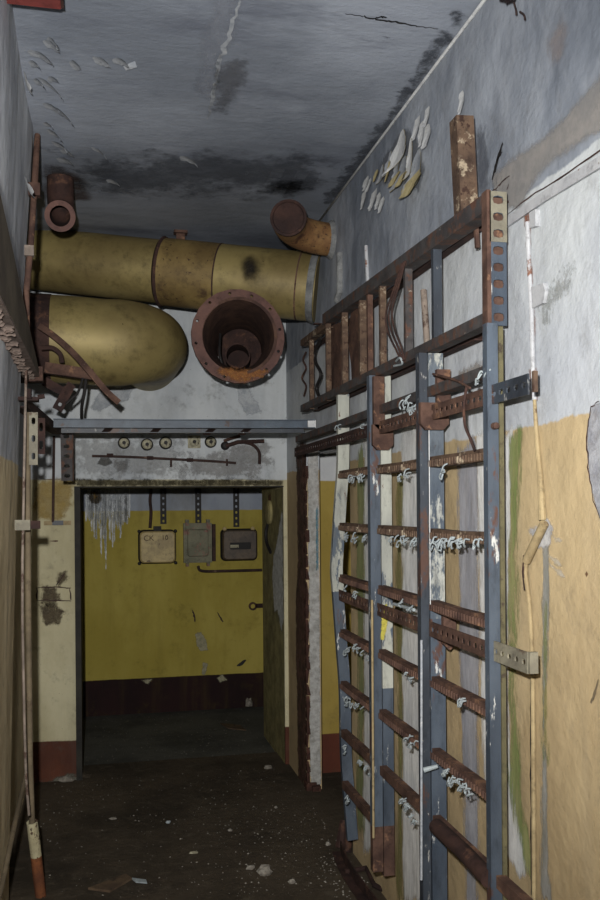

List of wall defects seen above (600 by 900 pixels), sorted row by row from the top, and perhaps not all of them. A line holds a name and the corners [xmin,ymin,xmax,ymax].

crack [346,14,436,29]
peeling [24,36,74,127]
damp [324,32,453,204]
peeling [360,106,431,213]
peeling [0,308,35,379]
flaking render [587,403,600,517]
damp [85,489,131,568]
spalling [296,441,321,792]